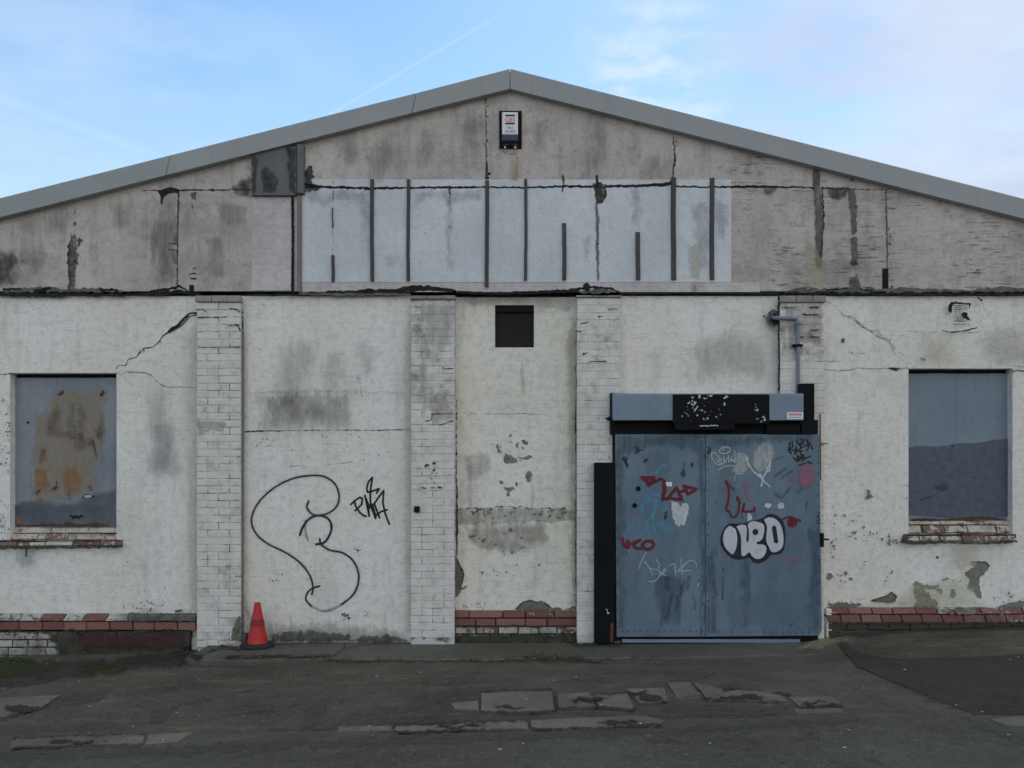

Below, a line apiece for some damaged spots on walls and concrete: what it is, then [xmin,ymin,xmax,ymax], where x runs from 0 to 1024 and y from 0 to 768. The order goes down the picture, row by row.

spalling [67,234,83,291]
crack [0,98,1024,393]
spalling [813,169,825,268]
spalling [849,178,861,291]
spalling [942,296,984,333]
peeling [467,431,567,576]
crack [571,399,579,607]
peeling [817,496,898,558]
spalling [828,561,1024,624]